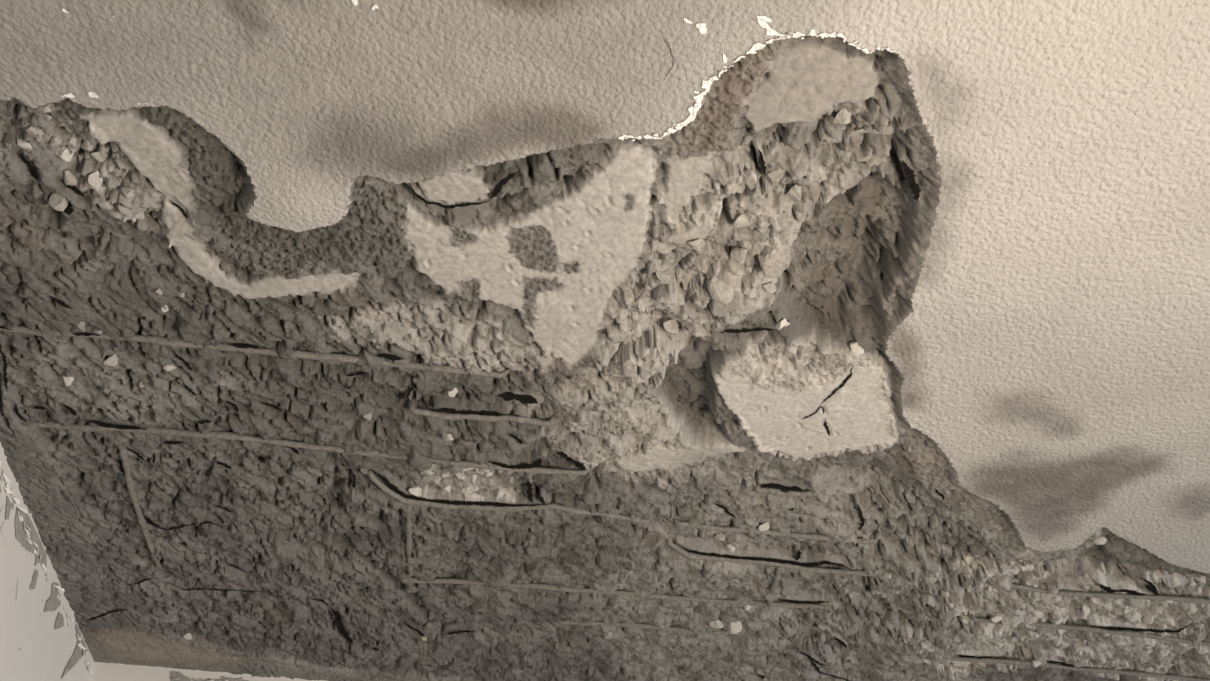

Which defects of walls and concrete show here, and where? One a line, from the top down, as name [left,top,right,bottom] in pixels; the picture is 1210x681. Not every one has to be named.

peeling [644,76,719,139]
spalling [743,169,757,190]
spalling [120,334,203,348]
spalling [409,393,556,426]
spalling [21,420,409,460]
spalling [430,458,591,475]
spalling [119,448,162,568]
spalling [367,470,653,524]
spalling [666,537,871,595]
spalling [642,594,830,610]
spalling [1056,590,1210,604]
spalling [1027,622,1194,644]